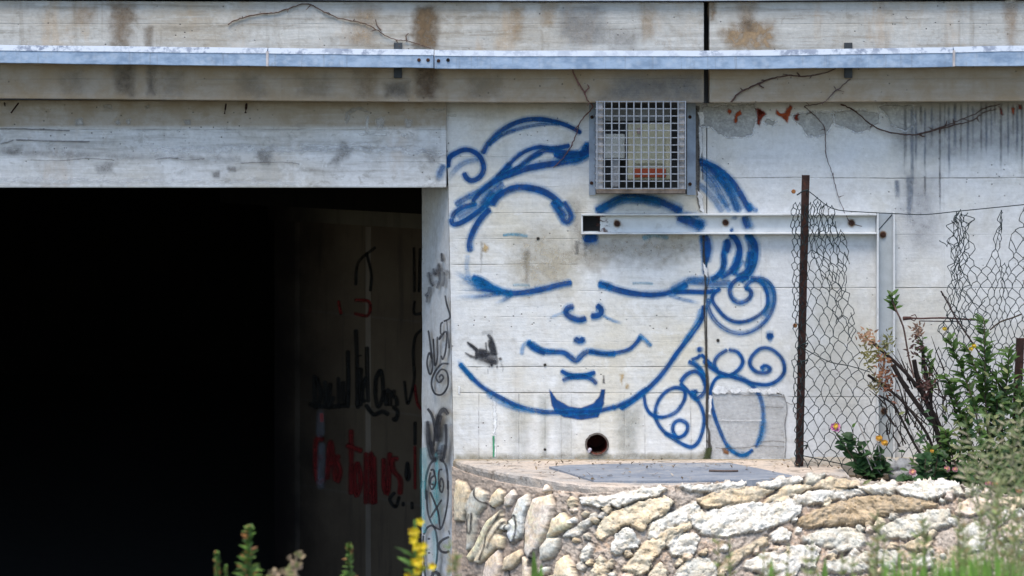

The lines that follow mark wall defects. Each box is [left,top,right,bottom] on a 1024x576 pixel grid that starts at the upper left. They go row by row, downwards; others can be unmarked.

peeling [699,103,777,139]
corrosion [755,106,799,125]
peeling [792,103,916,138]